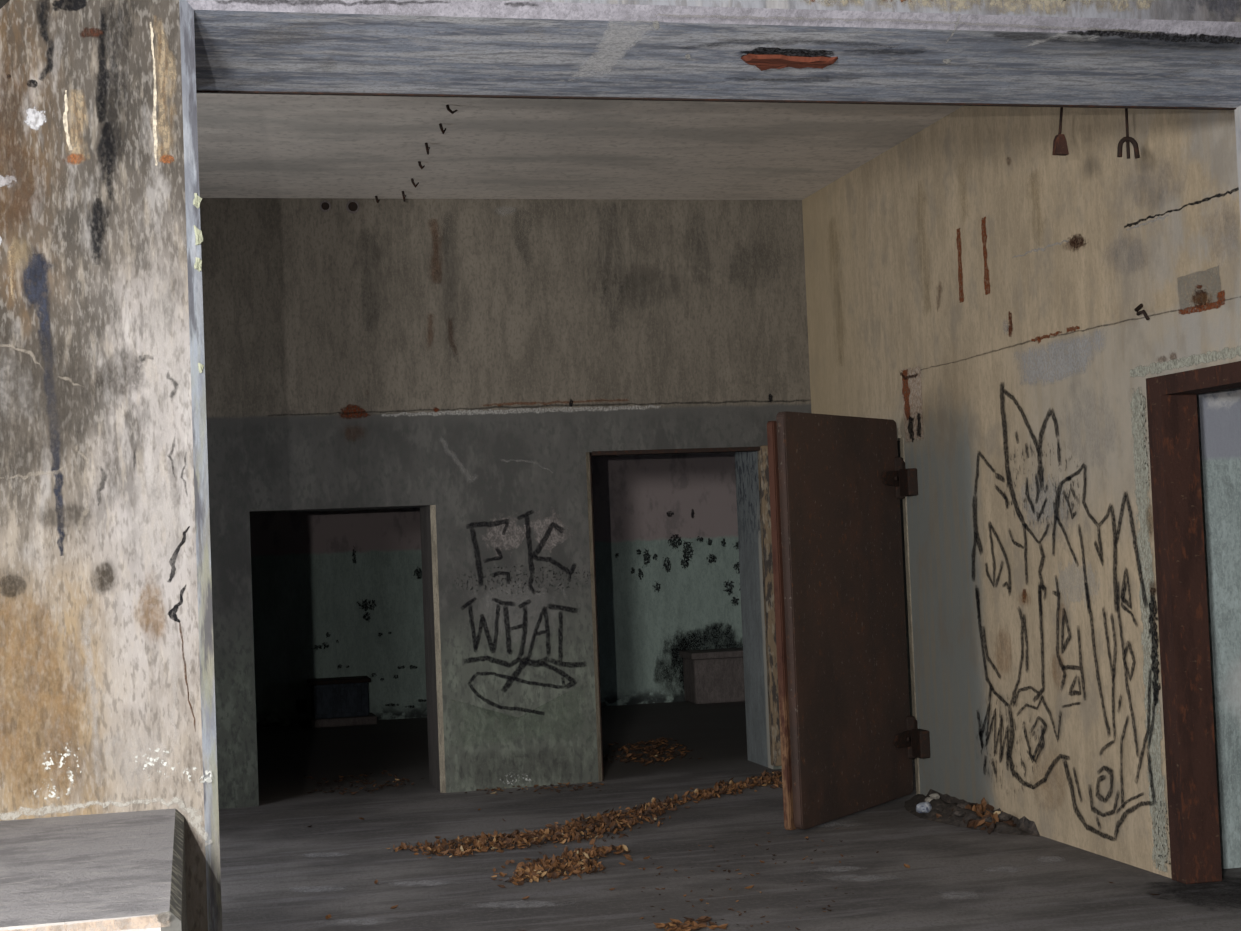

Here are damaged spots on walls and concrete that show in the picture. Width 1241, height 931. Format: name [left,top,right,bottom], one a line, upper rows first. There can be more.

damp [90,14,115,259]
crack [1124,187,1239,230]
rust [956,228,964,303]
rust [981,217,990,295]
damp [24,254,65,556]
rust [341,404,369,419]
crack [168,526,195,727]
damp [34,747,81,799]
damp [135,748,212,783]